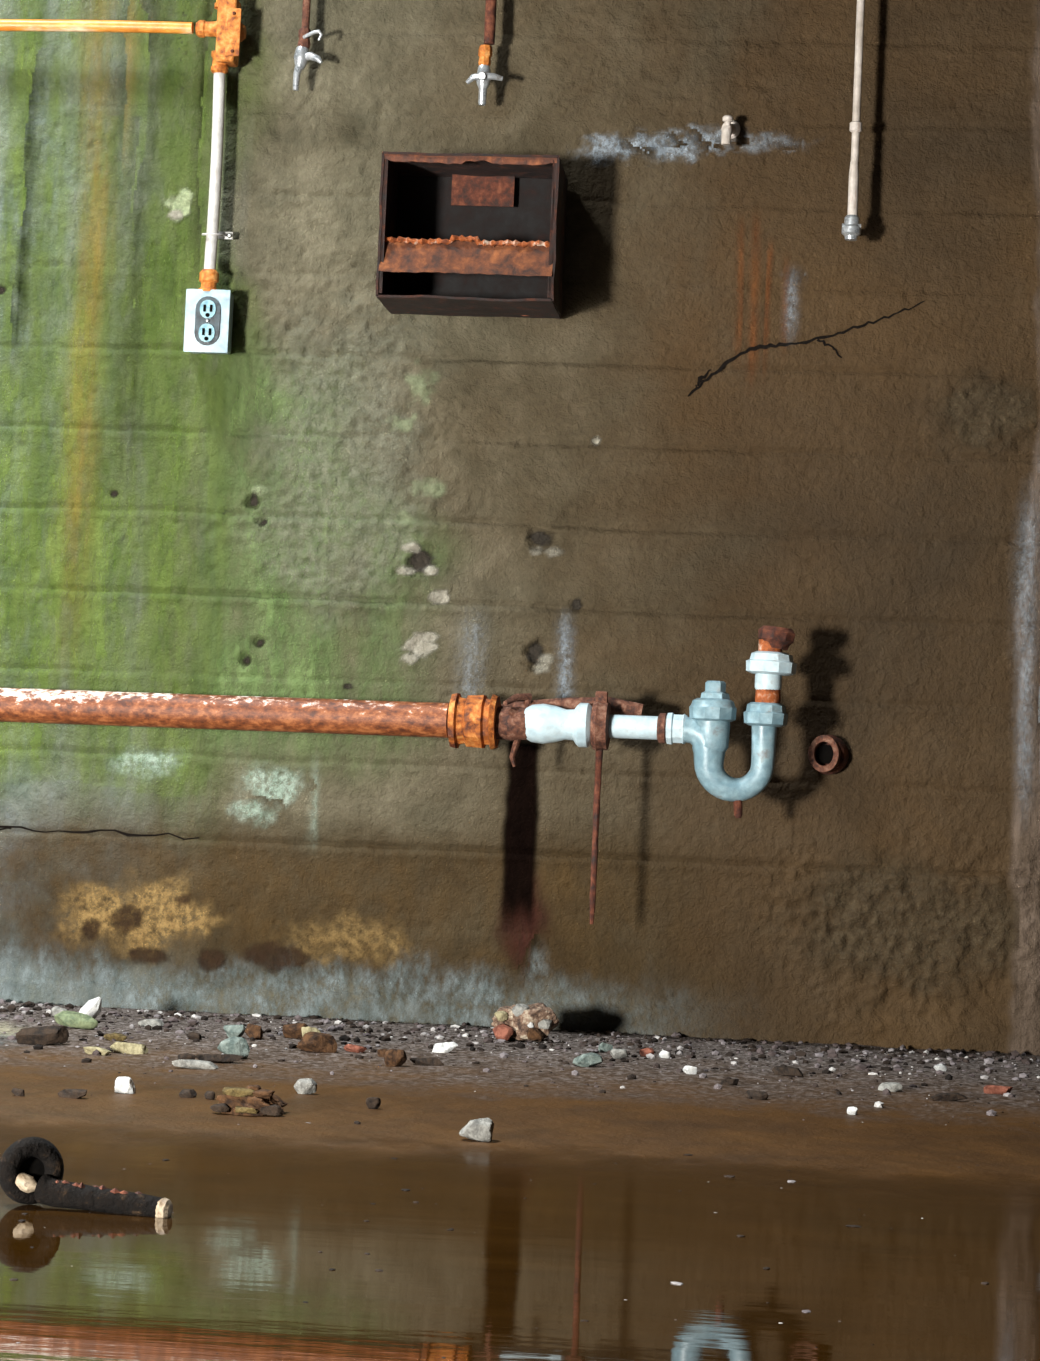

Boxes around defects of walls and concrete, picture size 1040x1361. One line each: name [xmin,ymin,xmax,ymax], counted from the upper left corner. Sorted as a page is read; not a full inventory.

leakage [0,0,41,338]
leakage [592,131,718,161]
crack [688,301,925,397]
leakage [253,774,294,800]
leakage [1010,434,1040,1055]
leakage [0,825,647,1026]